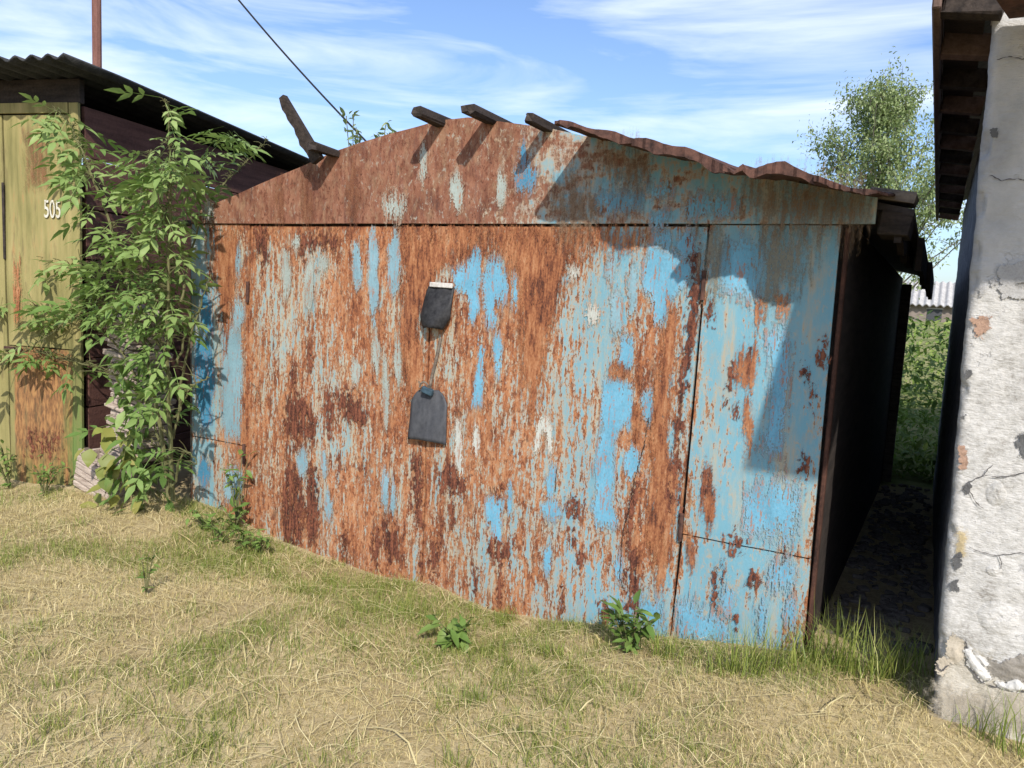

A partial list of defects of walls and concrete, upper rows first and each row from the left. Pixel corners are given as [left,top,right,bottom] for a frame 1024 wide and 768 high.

peeling [193,241,246,507]
corrosion [281,342,370,548]
peeling [350,186,408,433]
corrosion [408,441,470,585]
peeling [450,244,519,479]
corrosion [396,223,650,424]
corrosion [595,225,718,625]
peeling [584,173,766,537]
corrosion [698,456,748,612]
corrosion [723,293,791,459]
crack [962,466,1024,509]
flaking render [935,632,1024,693]